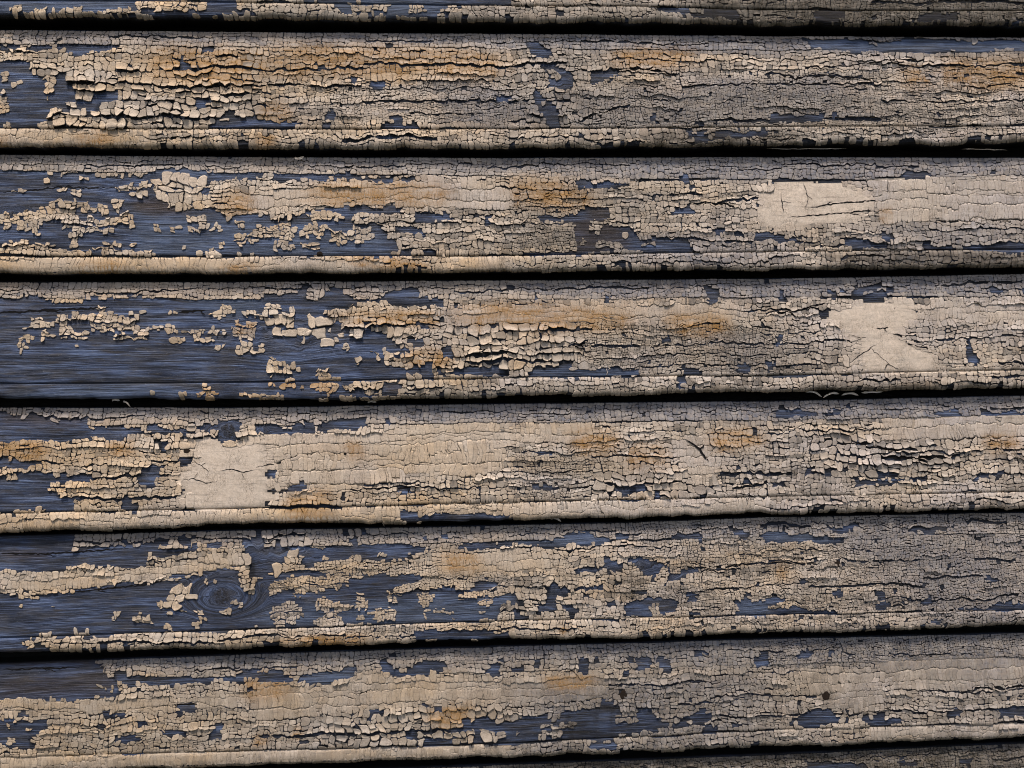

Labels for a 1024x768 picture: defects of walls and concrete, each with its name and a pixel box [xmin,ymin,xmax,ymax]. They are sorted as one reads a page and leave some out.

peeling [0,39,124,136]
crack [772,58,913,80]
peeling [186,91,342,138]
peeling [0,163,460,265]
peeling [518,171,694,266]
crack [695,184,905,217]
crack [849,327,928,369]
crack [184,436,470,496]
crack [685,439,708,460]
crack [773,428,959,461]
peeling [0,281,748,761]
peeling [781,704,910,733]